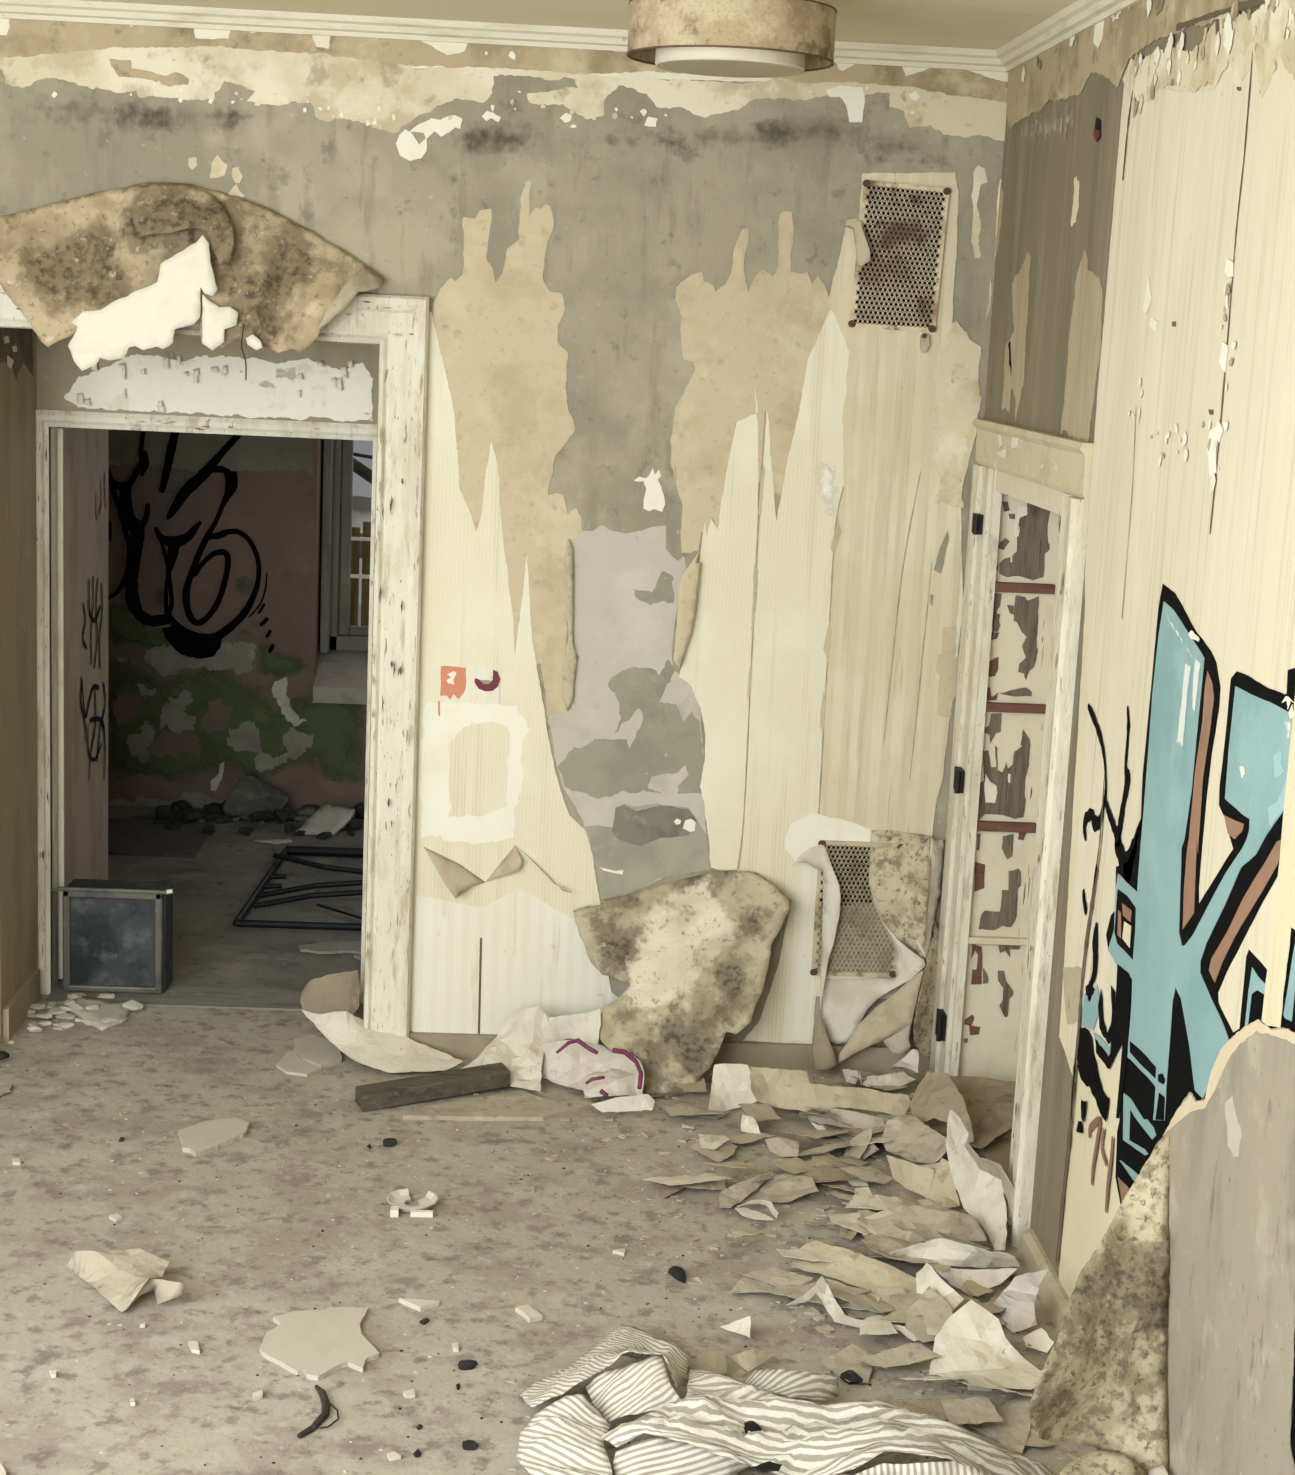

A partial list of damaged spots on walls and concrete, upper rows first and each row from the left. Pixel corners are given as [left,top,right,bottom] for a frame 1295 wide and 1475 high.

flaking render [593,71,787,82]
peeling [1123,0,1295,118]
peeling [188,155,244,198]
rust [882,223,924,249]
peeling [971,165,1002,258]
peeling [0,327,34,379]
peeling [64,354,382,445]
flaking render [933,320,982,508]
peeling [112,641,313,772]
flaking render [548,468,706,874]
peeling [971,495,1063,1017]
peeling [793,830,945,1070]